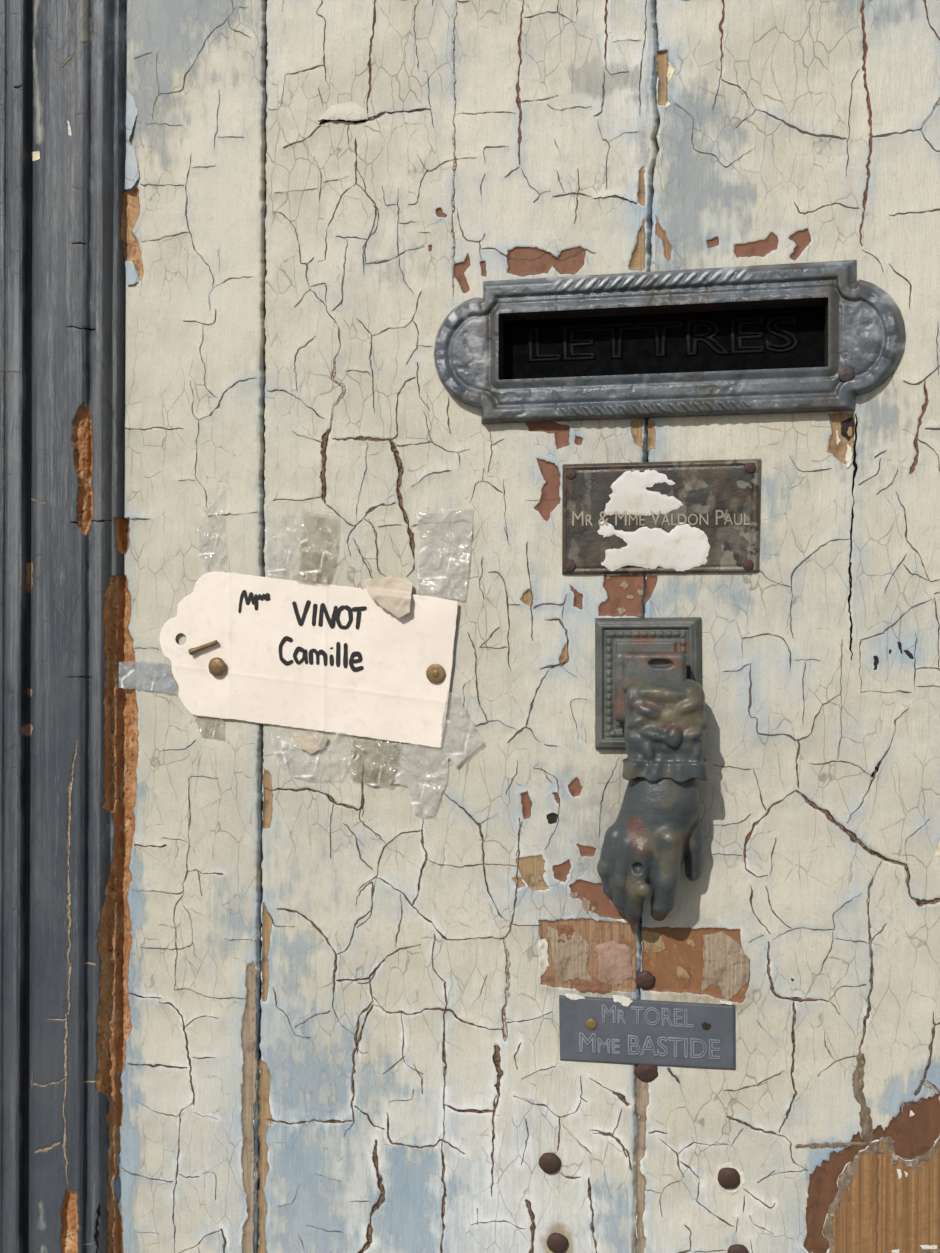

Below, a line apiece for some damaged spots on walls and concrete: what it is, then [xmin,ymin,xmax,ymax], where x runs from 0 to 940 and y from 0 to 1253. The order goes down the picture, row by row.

crack [676,0,940,308]
peeling [454,253,486,293]
peeling [507,246,586,276]
peeling [734,228,811,260]
crack [107,0,647,850]
peeling [525,421,583,521]
spalling [827,412,855,468]
peeling [598,574,658,617]
crack [227,327,940,1253]
peeling [511,843,625,919]
crack [122,740,247,1253]
peeling [795,1053,940,1253]